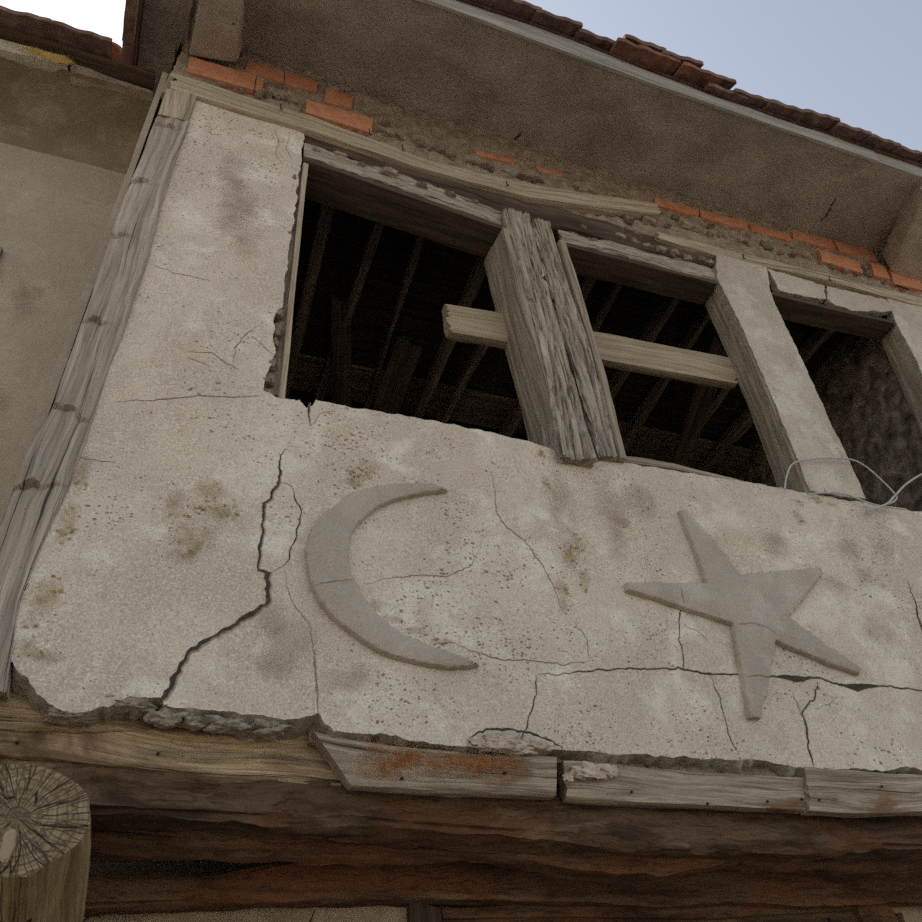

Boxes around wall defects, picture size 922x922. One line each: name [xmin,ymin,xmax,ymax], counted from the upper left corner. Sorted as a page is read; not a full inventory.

spalling [263,166,302,397]
crack [190,328,271,369]
crack [115,394,251,402]
crack [160,449,320,716]
crack [435,472,846,765]
crack [909,585,922,629]
crack [878,684,922,692]
spalling [40,707,94,726]
spalling [106,694,295,740]
spalling [467,734,551,756]